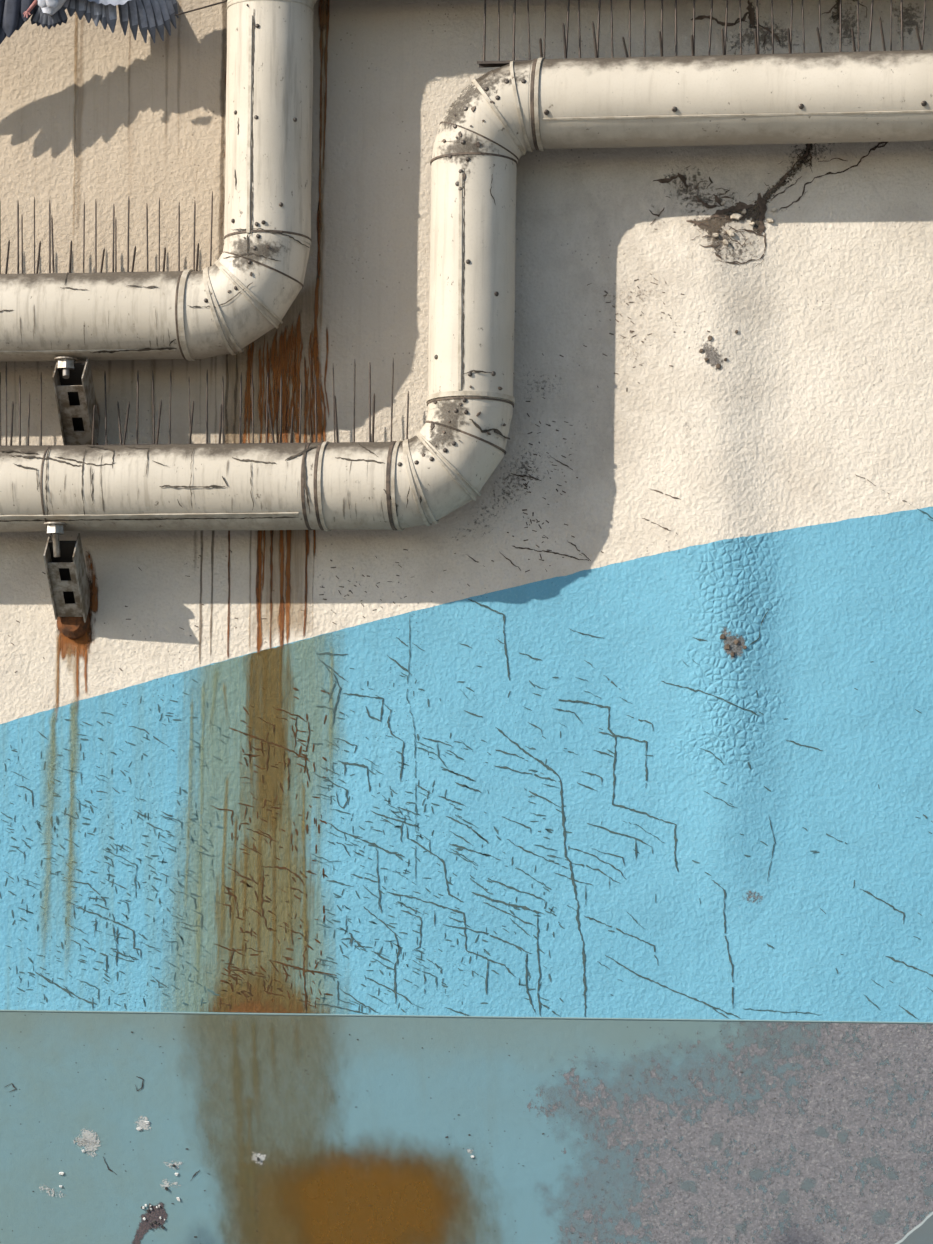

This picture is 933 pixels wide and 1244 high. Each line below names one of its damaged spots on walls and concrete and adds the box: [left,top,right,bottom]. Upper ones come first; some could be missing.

corrosion [219,0,227,257]
corrosion [225,0,330,443]
flaking render [699,335,727,370]
crack [469,542,591,569]
crack [642,489,679,535]
corrosion [48,553,98,797]
corrosion [177,530,333,1014]
crack [0,599,823,1019]
crack [700,748,847,881]
crack [853,880,933,1020]
spalling [132,1161,182,1244]
peeling [527,1022,933,1244]